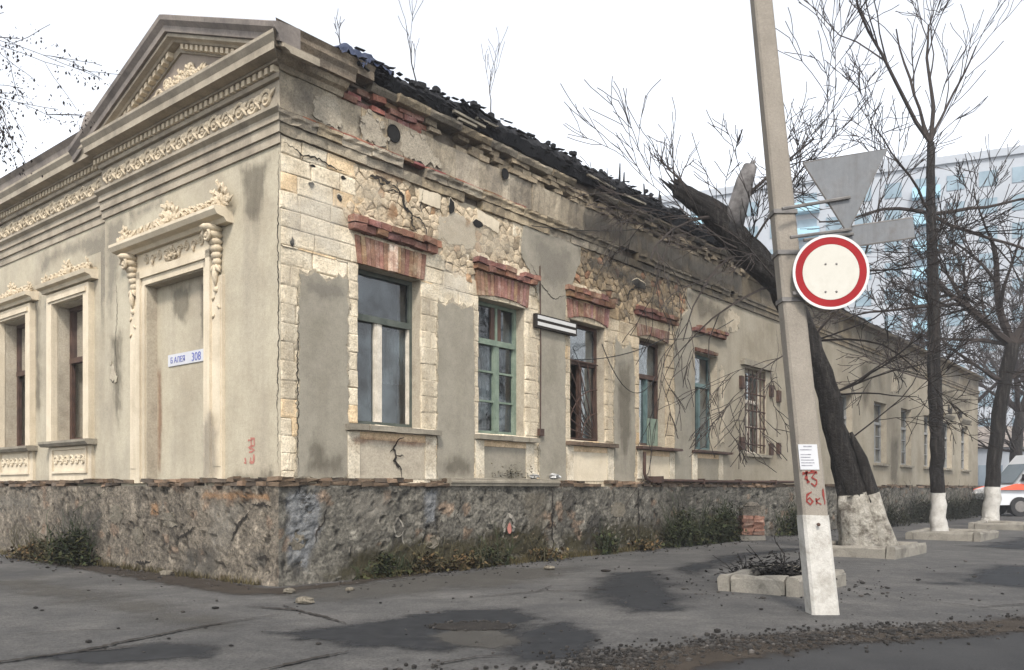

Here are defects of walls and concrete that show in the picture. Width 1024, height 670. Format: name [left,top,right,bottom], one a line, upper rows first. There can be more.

crack [370,174,427,234]
spalling [337,164,529,283]
spalling [573,247,688,323]
crack [390,437,404,477]